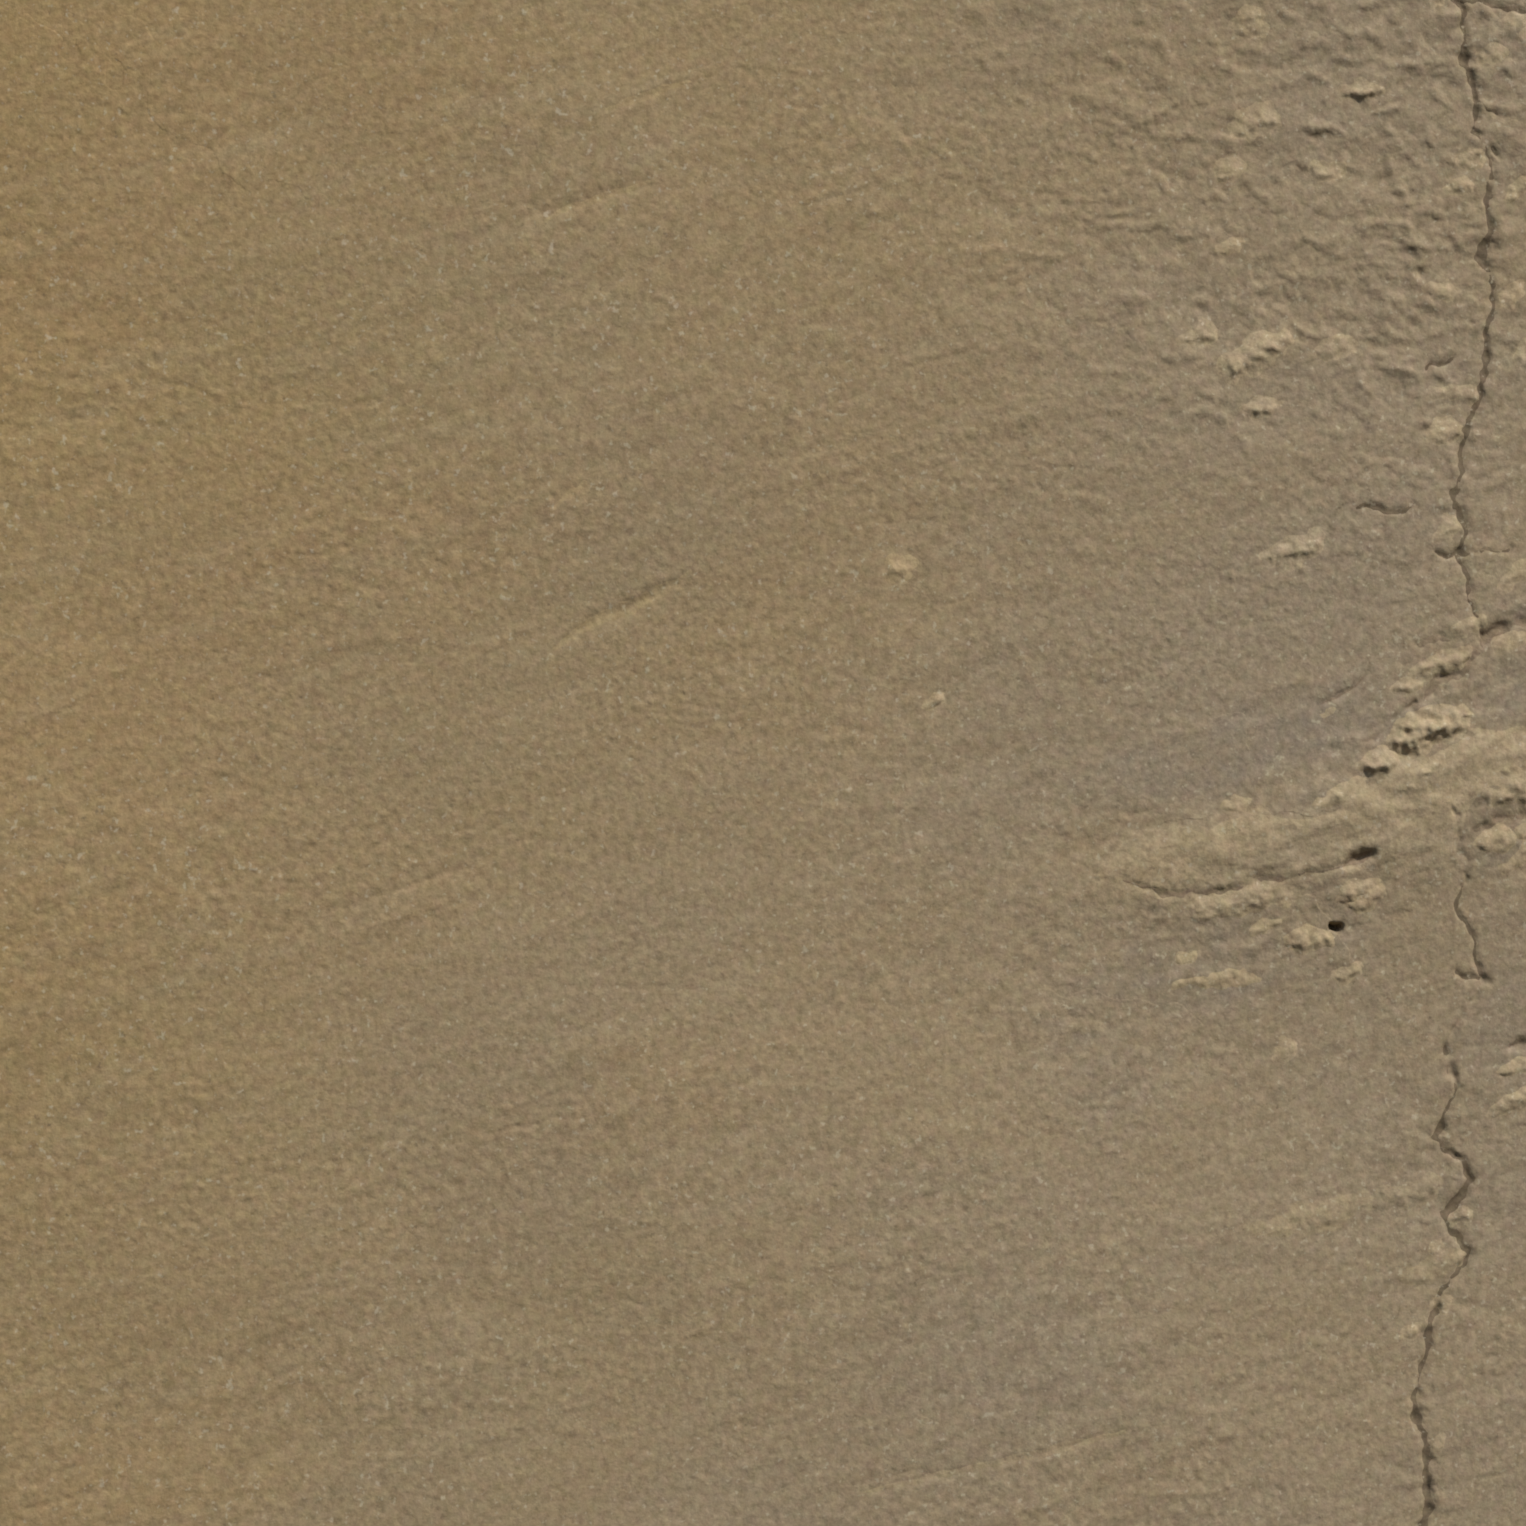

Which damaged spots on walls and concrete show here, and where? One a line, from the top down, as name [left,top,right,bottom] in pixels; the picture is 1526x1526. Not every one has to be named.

crack [1356,0,1526,708]
crack [1454,884,1483,980]
crack [1399,1044,1476,1526]